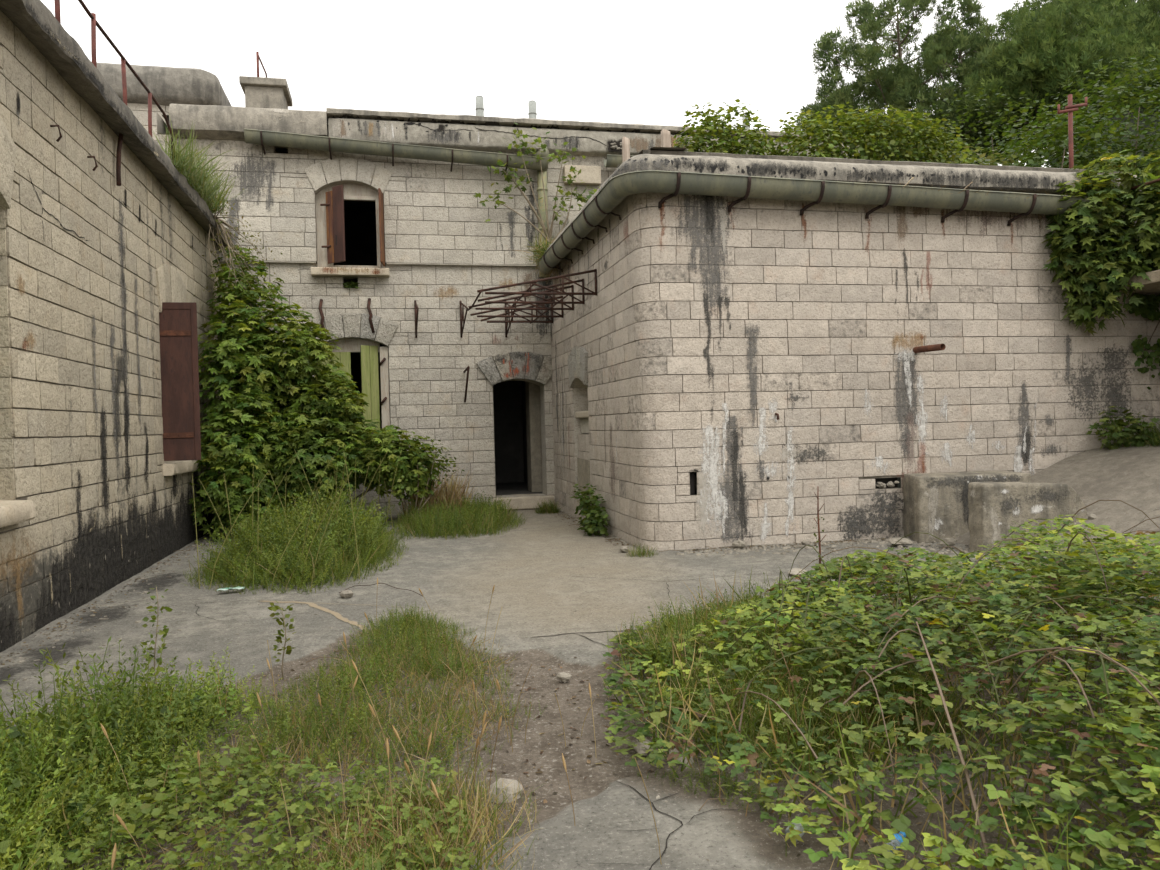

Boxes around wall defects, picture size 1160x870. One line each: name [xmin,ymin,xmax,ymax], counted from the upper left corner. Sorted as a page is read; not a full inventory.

leakage [0,200,219,653]
leakage [675,194,797,542]
leakage [895,350,953,467]
leakage [0,639,92,684]
crack [603,781,757,870]